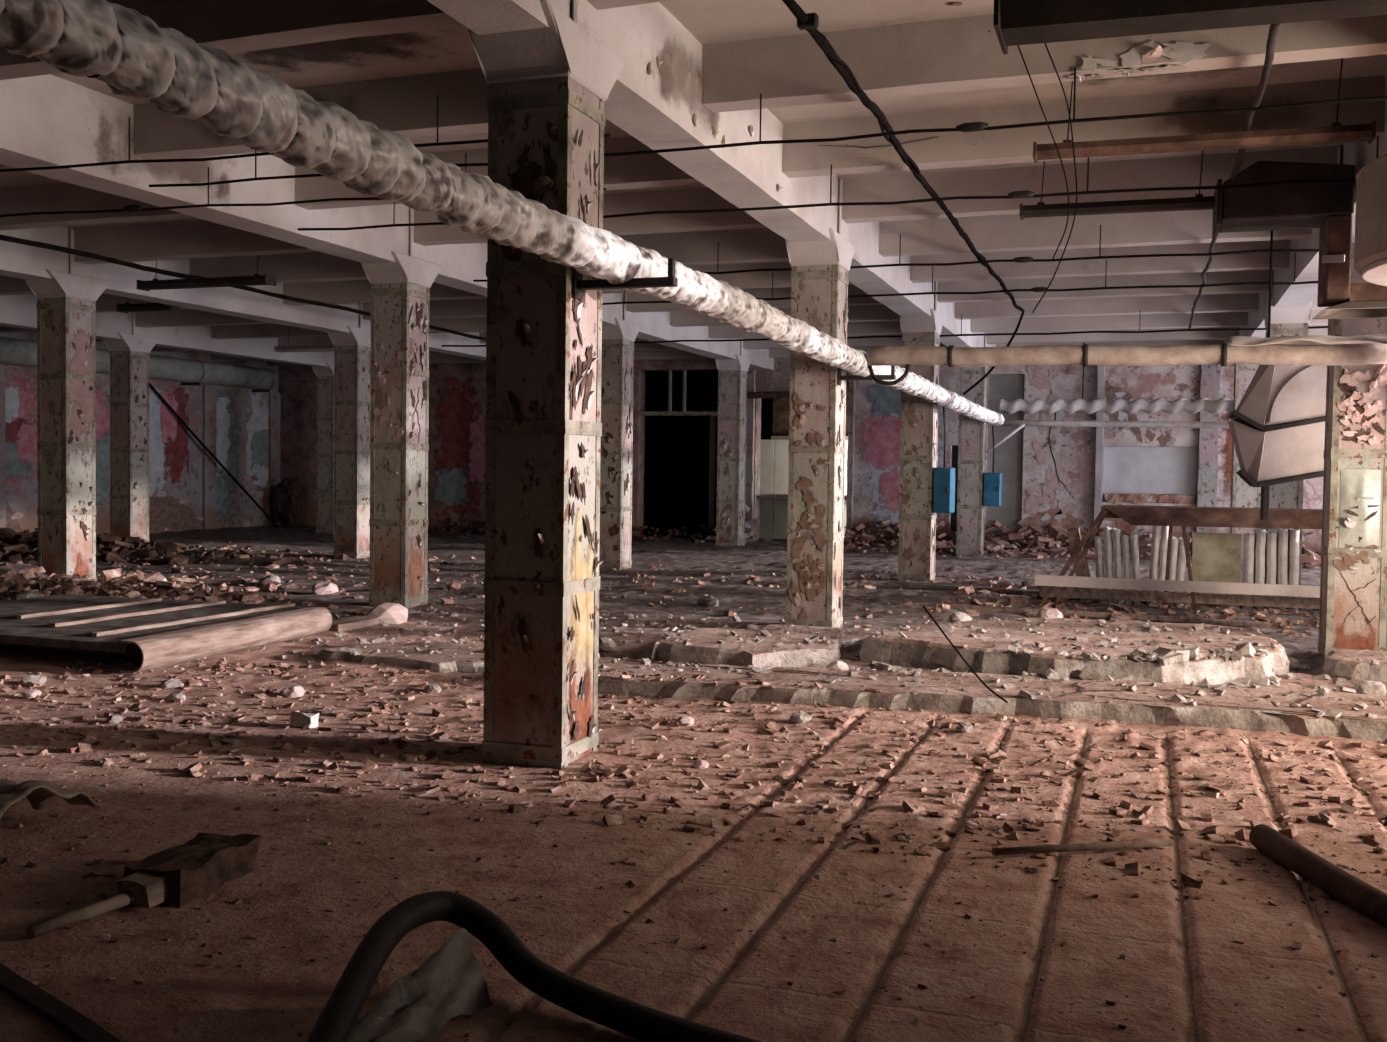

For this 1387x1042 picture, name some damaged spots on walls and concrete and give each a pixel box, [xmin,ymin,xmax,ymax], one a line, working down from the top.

peeling [510,121,558,201]
peeling [360,302,429,442]
peeling [568,290,632,577]
flaking render [1336,364,1387,446]
peeling [80,482,94,541]
flaking render [133,481,203,532]
flaking render [222,474,269,528]
peeling [788,390,846,620]
rust [76,554,90,578]
peeling [1333,544,1387,571]
peeling [569,595,596,643]
peeling [569,660,597,741]